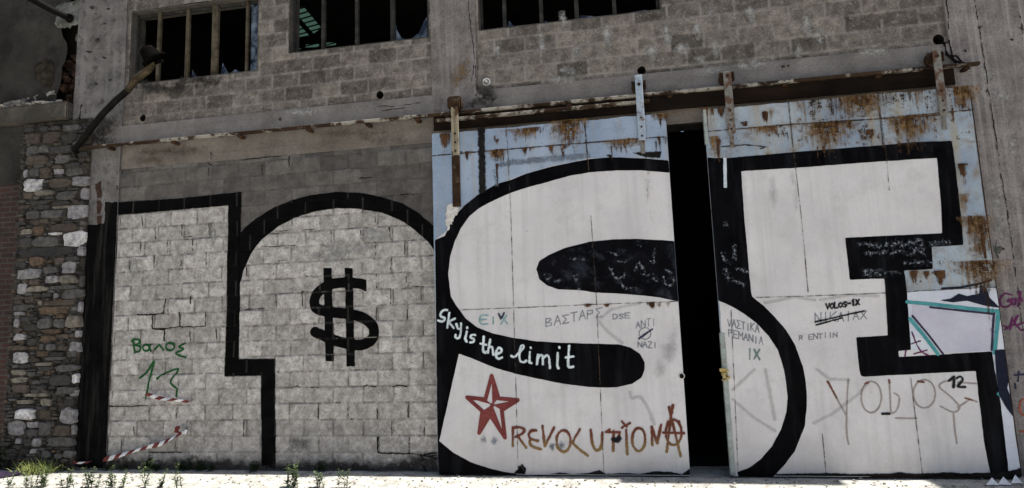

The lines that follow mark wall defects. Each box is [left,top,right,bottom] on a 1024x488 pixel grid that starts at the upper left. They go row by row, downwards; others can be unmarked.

spalling [2,91,56,106]
corrosion [440,133,450,148]
corrosion [490,136,504,180]
corrosion [508,119,586,156]
corrosion [605,138,640,161]
corrosion [702,107,724,162]
corrosion [741,85,979,160]
crack [974,0,1023,328]
corrosion [910,194,1008,314]